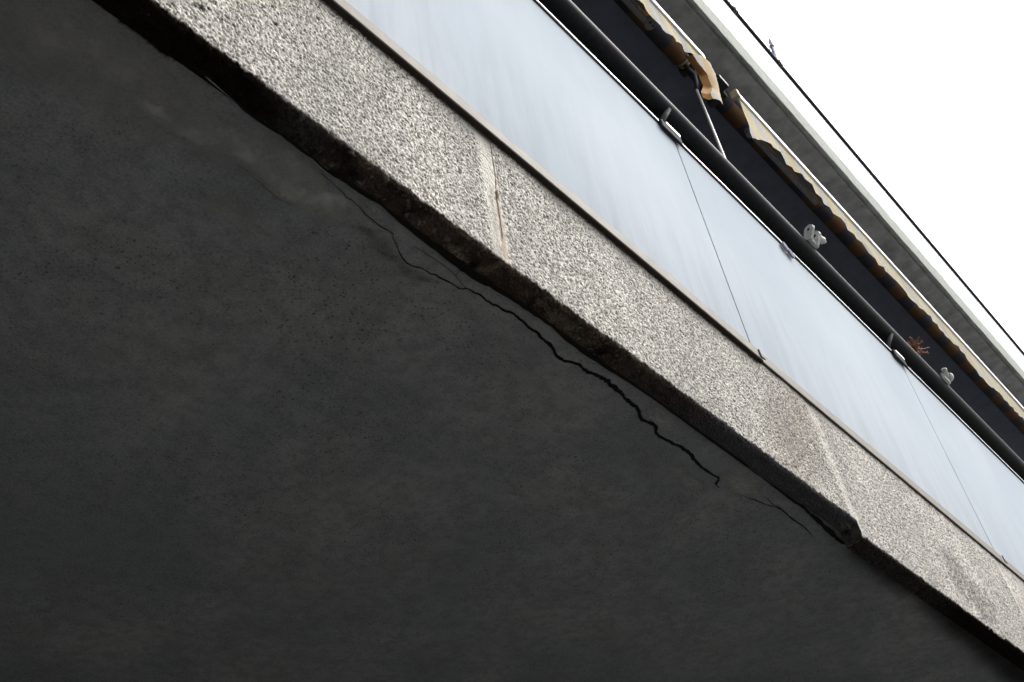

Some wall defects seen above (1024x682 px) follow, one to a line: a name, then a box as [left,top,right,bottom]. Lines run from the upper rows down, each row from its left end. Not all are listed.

crack [187,64,845,545]